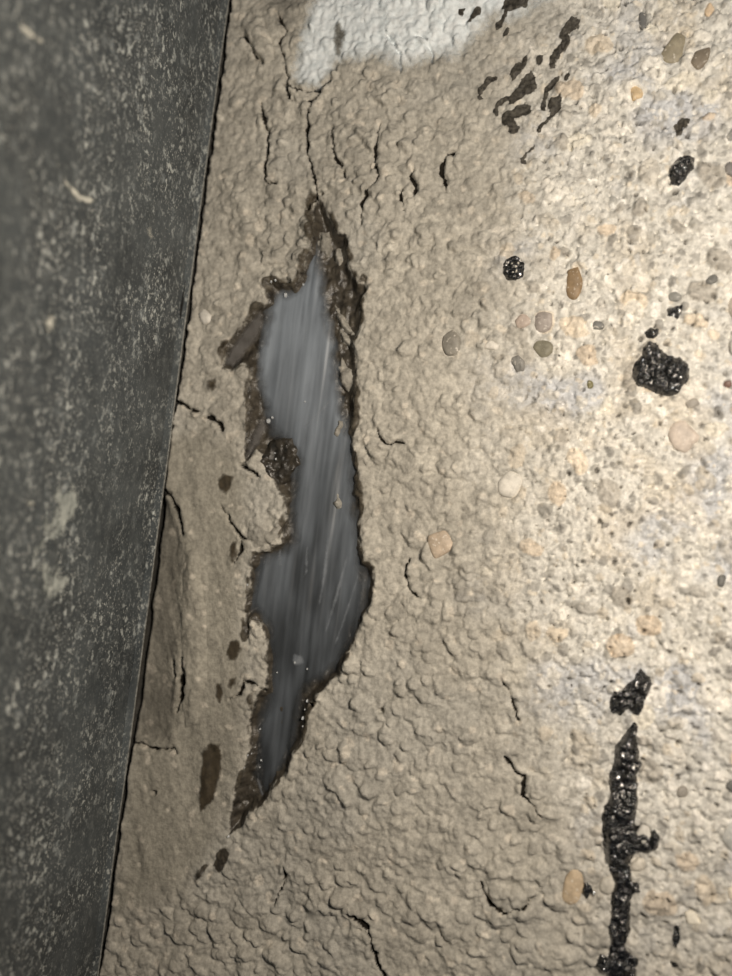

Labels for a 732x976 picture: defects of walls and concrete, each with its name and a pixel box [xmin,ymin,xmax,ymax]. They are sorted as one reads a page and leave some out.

crack [243,17,343,201]
crack [360,139,379,218]
crack [399,173,418,202]
crack [439,153,455,188]
spalling [218,193,374,833]
crack [504,756,541,816]
crack [481,881,531,915]
crack [347,914,386,976]